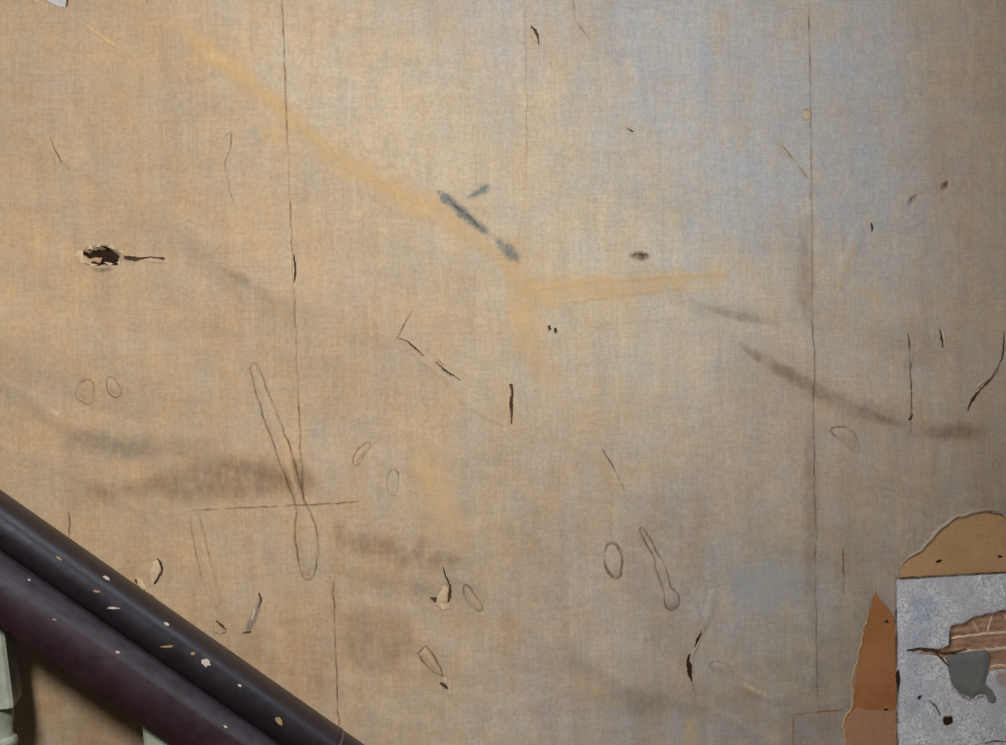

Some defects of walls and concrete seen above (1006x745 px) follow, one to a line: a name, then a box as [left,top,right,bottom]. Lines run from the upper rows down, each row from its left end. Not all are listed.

peeling [75,244,125,267]
crack [967,331,1005,410]
crack [506,384,514,424]
peeling [435,585,450,610]
peeling [842,494,1006,745]